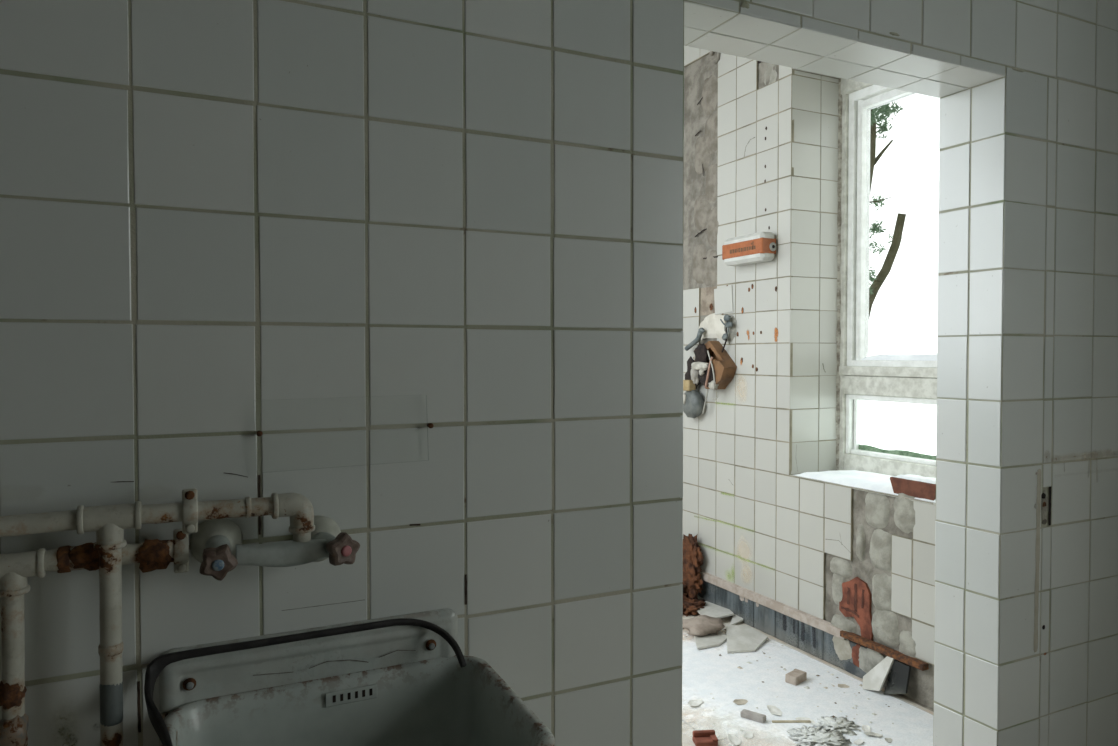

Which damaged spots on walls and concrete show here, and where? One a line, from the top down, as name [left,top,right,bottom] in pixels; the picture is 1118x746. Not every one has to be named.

spalling [683,51,721,323]
spalling [825,489,916,678]